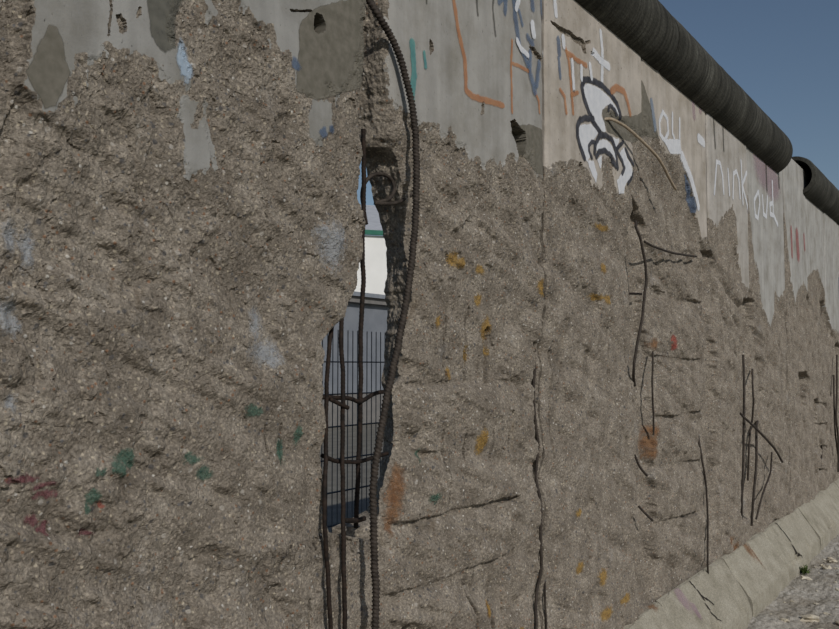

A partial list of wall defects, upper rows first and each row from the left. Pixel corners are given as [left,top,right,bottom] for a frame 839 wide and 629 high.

spalling [551,21,592,54]
spalling [0,0,420,629]
spalling [376,81,839,629]